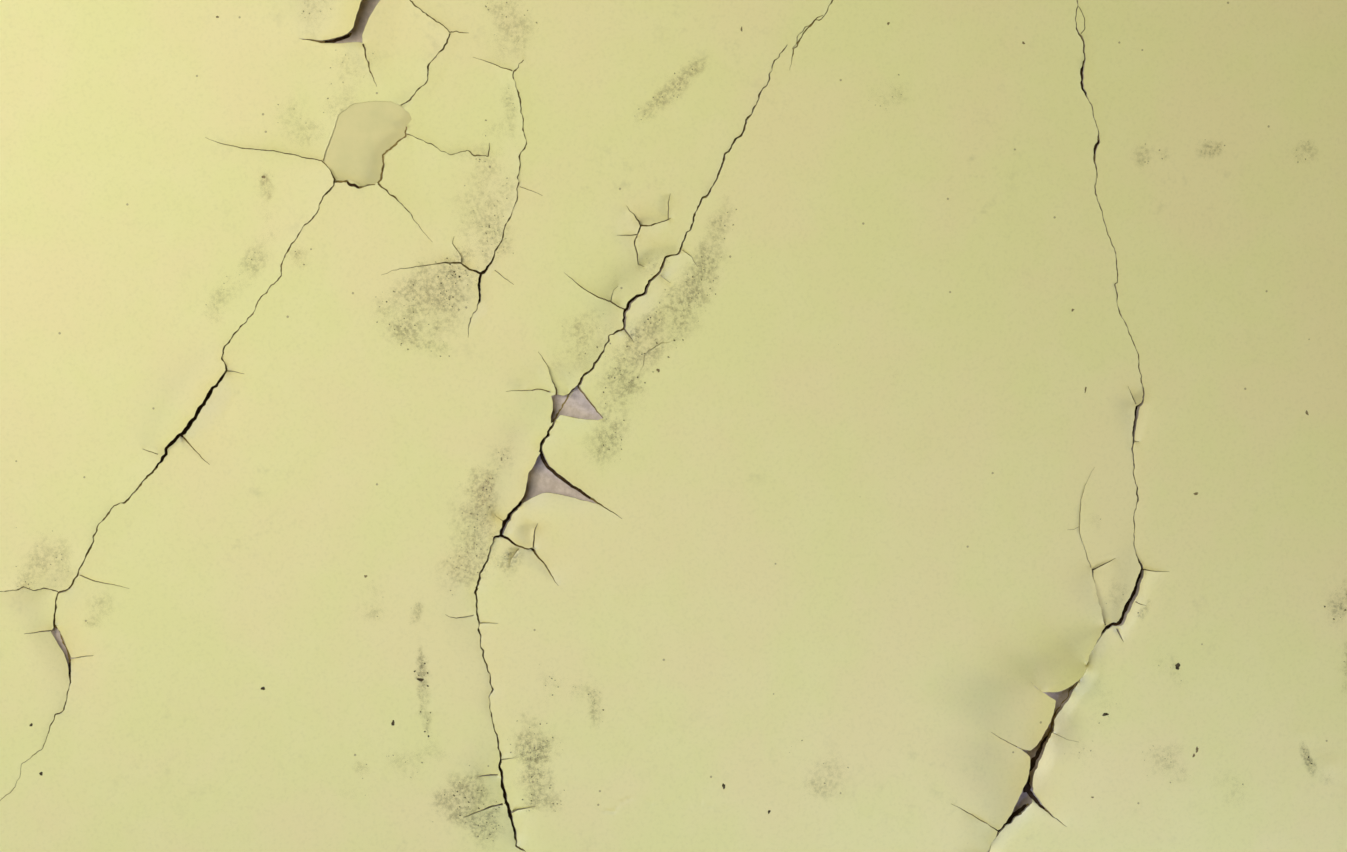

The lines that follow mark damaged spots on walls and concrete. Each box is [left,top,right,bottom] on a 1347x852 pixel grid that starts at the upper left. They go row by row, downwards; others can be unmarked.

crack [0,0,541,823]
peeling [458,323,633,597]
peeling [890,583,1125,827]